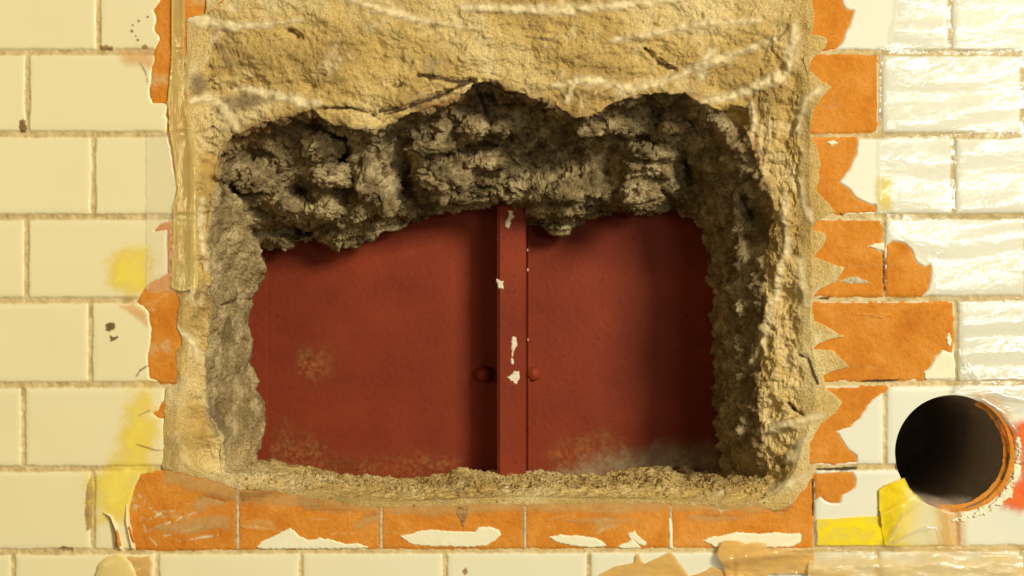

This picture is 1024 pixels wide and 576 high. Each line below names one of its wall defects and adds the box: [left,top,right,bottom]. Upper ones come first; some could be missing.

crack [321,74,518,119]
spalling [203,81,774,475]
peeling [924,333,956,380]
peeling [257,528,368,550]
peeling [400,526,501,548]
peeling [549,530,646,549]
peeling [704,532,802,548]